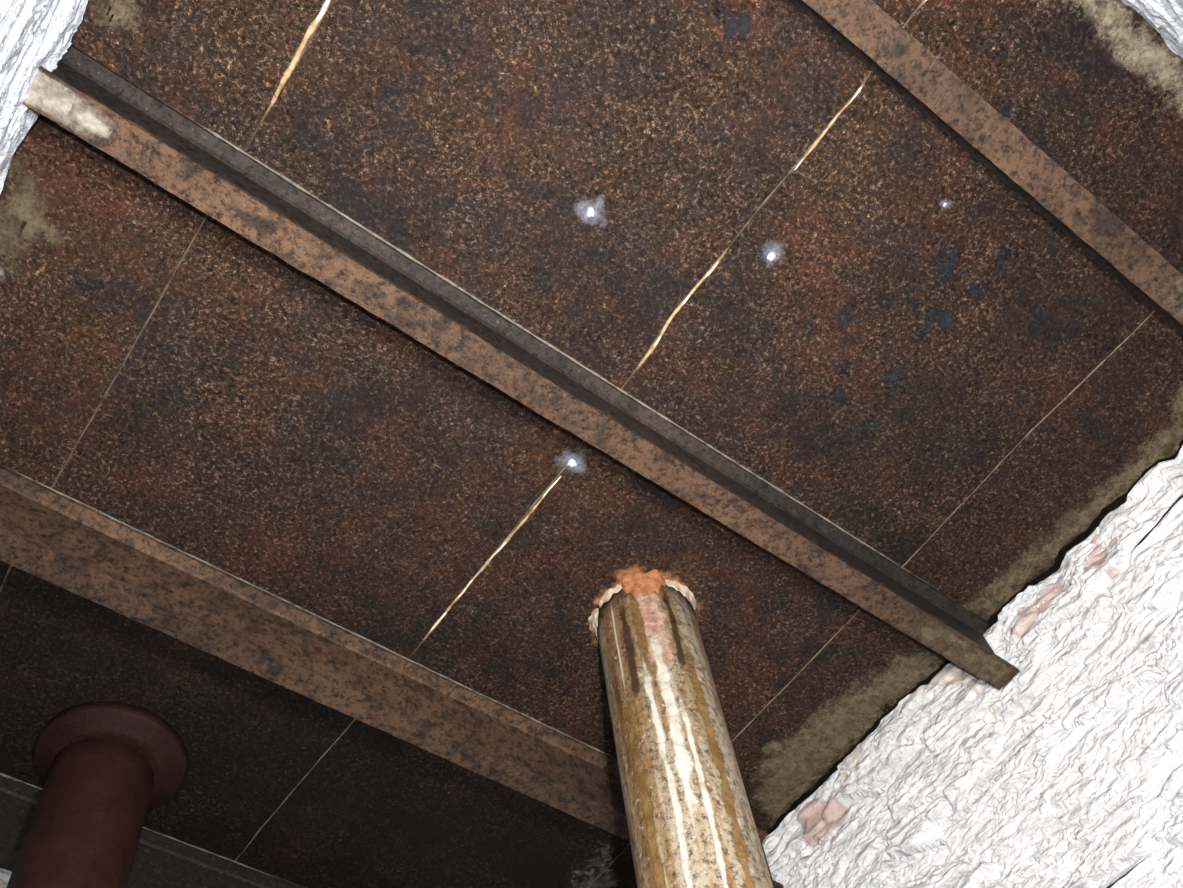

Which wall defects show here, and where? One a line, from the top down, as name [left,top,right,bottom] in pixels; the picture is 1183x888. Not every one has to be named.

corrosion [267,0,331,111]
water stain [1077,0,1183,114]
corrosion [795,86,862,169]
corrosion [638,254,724,367]
corrosion [425,477,561,639]
corrosion [588,567,701,644]
water stain [963,387,1183,617]
water stain [753,623,1012,825]